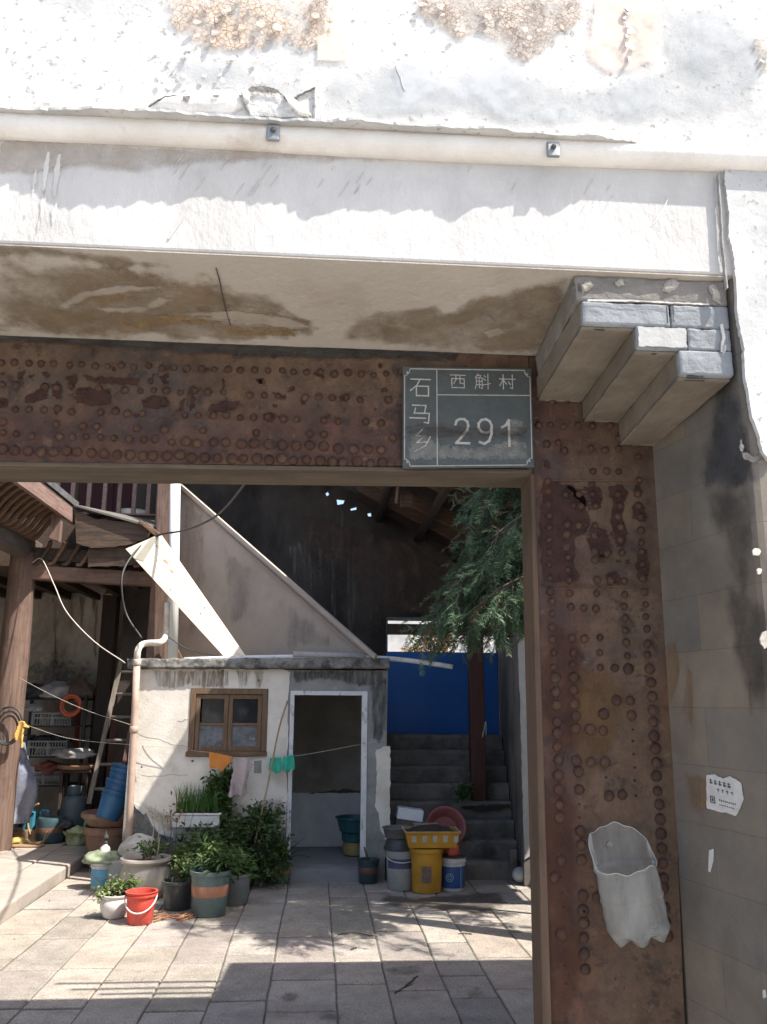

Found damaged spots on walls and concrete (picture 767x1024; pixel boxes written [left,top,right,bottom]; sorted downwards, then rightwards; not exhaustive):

flaking render [158,0,351,83]
flaking render [419,0,661,70]
flaking render [241,80,311,118]
damp [0,248,562,360]
peeling [539,481,650,584]
damp [156,670,261,688]
damp [294,671,387,742]
flaking render [375,746,391,840]
rust [545,799,581,1012]